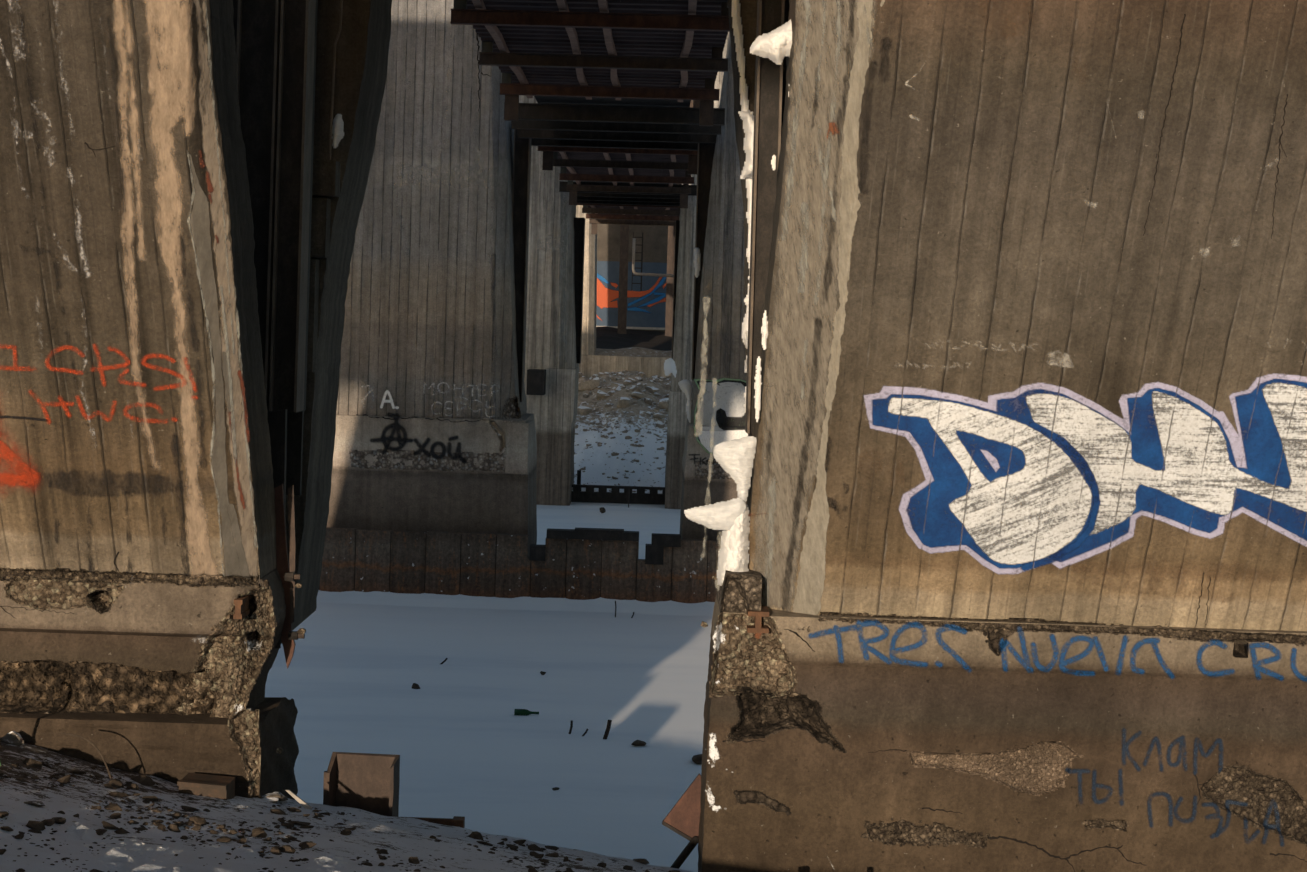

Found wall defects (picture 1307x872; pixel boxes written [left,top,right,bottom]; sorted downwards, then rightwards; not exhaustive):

spalling [0,569,283,799]
spalling [700,613,847,753]
spalling [907,741,1084,796]
spalling [733,790,791,816]
spalling [860,818,991,848]
crack [988,836,1147,872]
spalling [1202,765,1307,847]